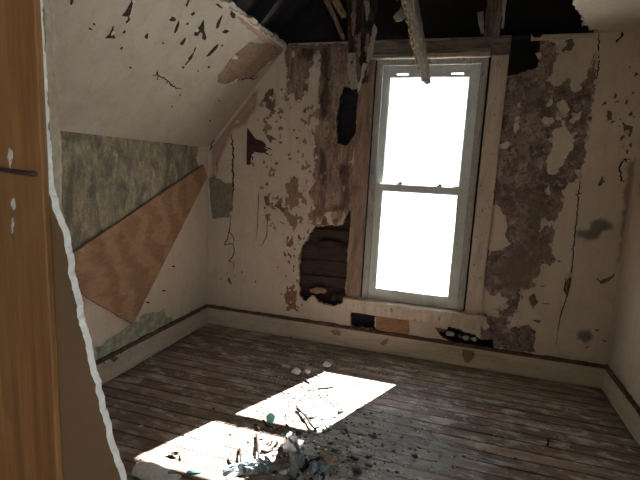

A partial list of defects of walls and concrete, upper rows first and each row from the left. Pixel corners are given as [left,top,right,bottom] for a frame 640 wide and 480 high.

peeling [603,101,633,147]
peeling [208,175,234,219]
peeling [217,42,358,312]
peeling [435,35,601,353]
crack [618,158,630,182]
crack [224,219,235,269]
crack [542,170,582,344]
leakage [579,220,608,238]
peeling [350,312,410,334]